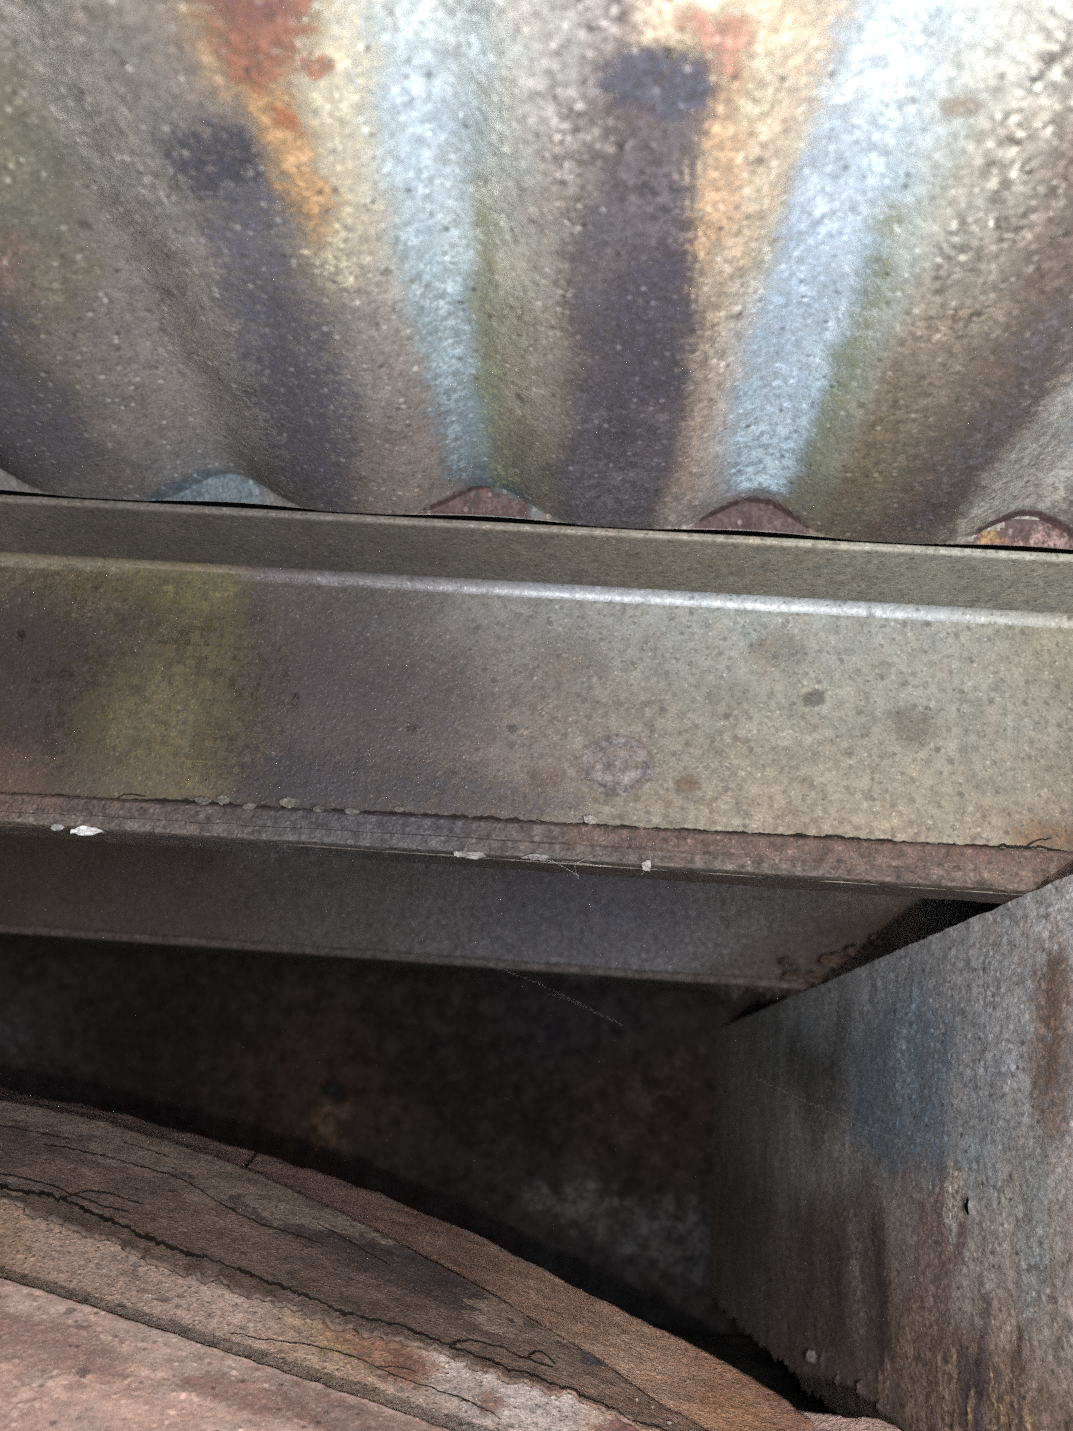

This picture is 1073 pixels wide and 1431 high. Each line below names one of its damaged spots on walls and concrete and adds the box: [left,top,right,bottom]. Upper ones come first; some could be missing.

corrosion [177,0,345,239]
water stain [165,0,727,529]
water stain [953,371,1073,543]
corrosion [570,819,1073,868]
corrosion [1027,937,1073,1146]
crack [0,1125,666,1431]
corrosion [806,1160,1073,1431]